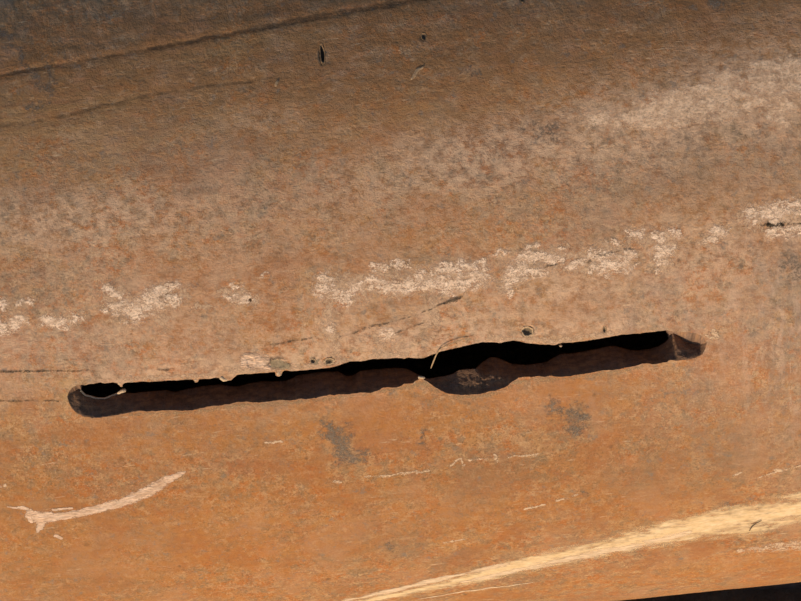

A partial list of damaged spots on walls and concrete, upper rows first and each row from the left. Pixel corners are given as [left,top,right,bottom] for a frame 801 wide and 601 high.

crack [0,367,82,375]